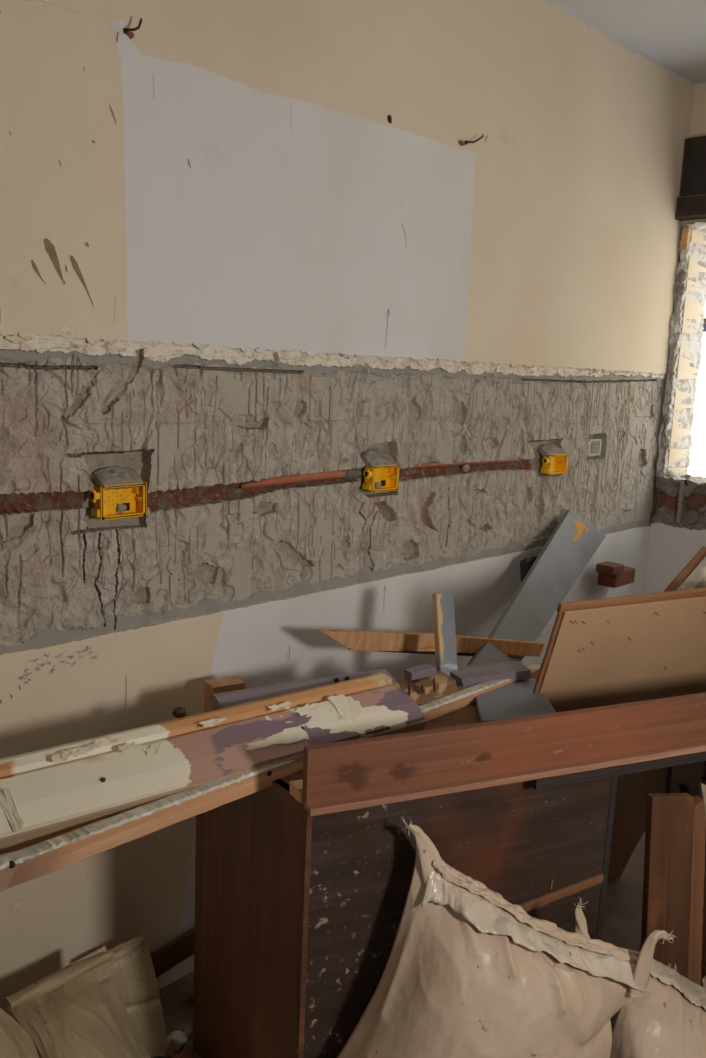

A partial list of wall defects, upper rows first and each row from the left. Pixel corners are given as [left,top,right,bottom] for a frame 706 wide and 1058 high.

spalling [0,225,706,654]